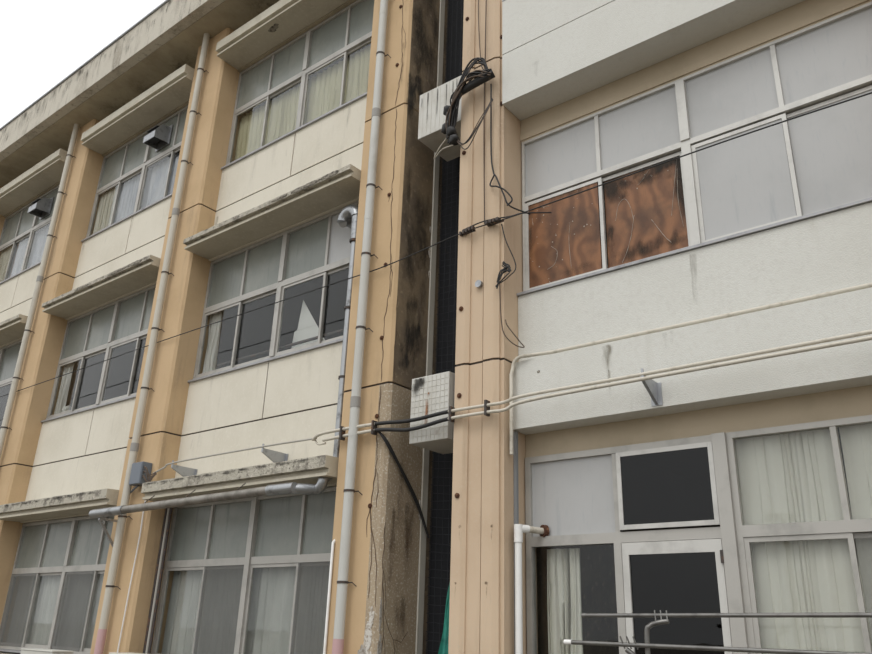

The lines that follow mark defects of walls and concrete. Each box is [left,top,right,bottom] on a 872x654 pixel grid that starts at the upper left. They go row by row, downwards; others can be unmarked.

water stain [407,67,457,112]
crack [366,0,408,654]
peeling [357,598,383,654]